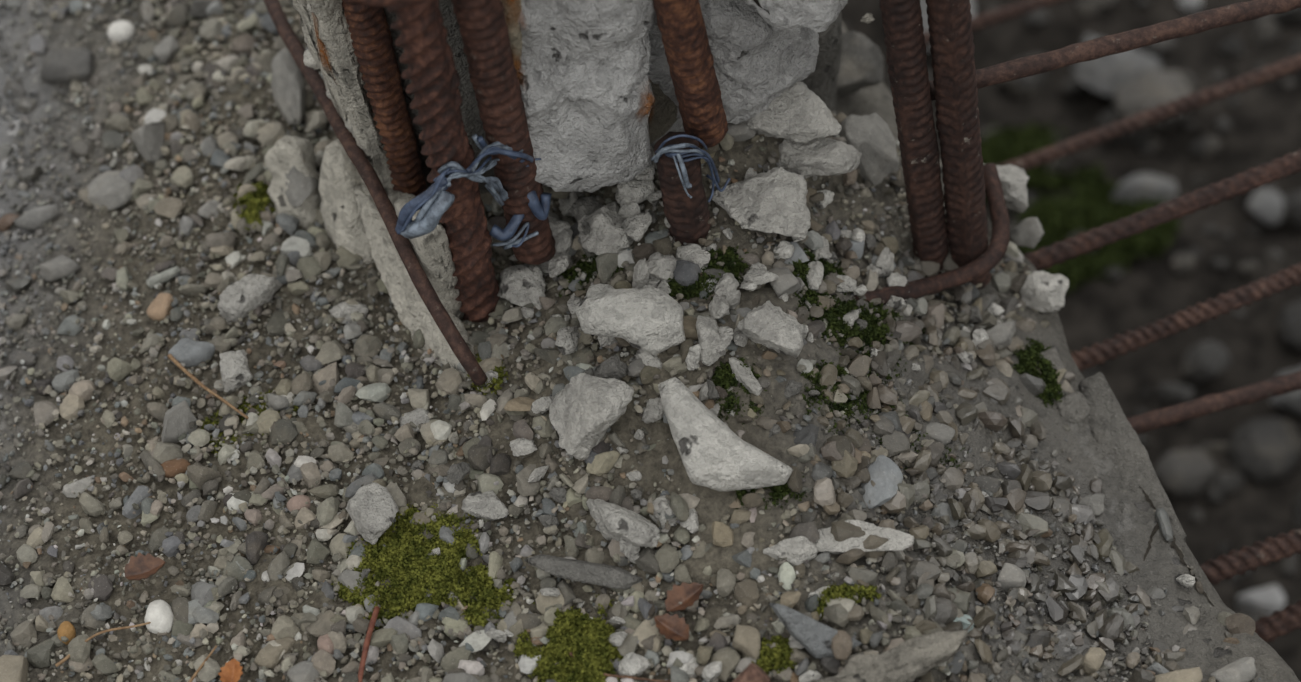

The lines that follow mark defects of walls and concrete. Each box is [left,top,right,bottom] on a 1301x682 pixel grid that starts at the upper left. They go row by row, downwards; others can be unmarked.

corrosion [315,28,331,70]
spalling [293,0,474,381]
spalling [501,0,685,193]
spalling [699,0,848,124]